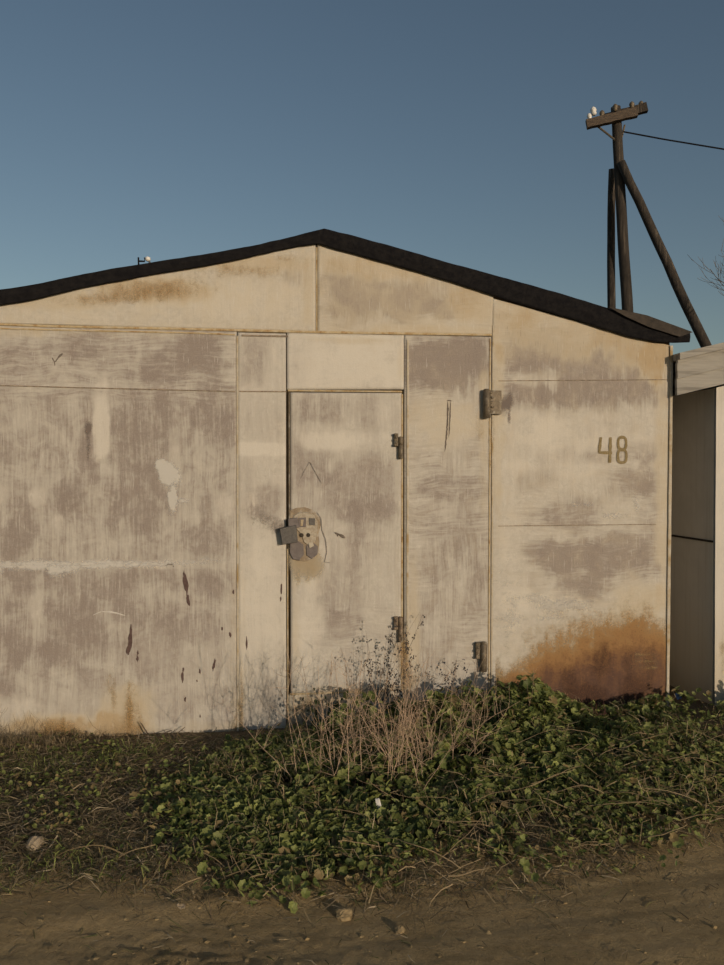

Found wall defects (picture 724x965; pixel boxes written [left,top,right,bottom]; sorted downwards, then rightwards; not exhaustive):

peeling [155,459,189,512]
rust [496,613,667,706]